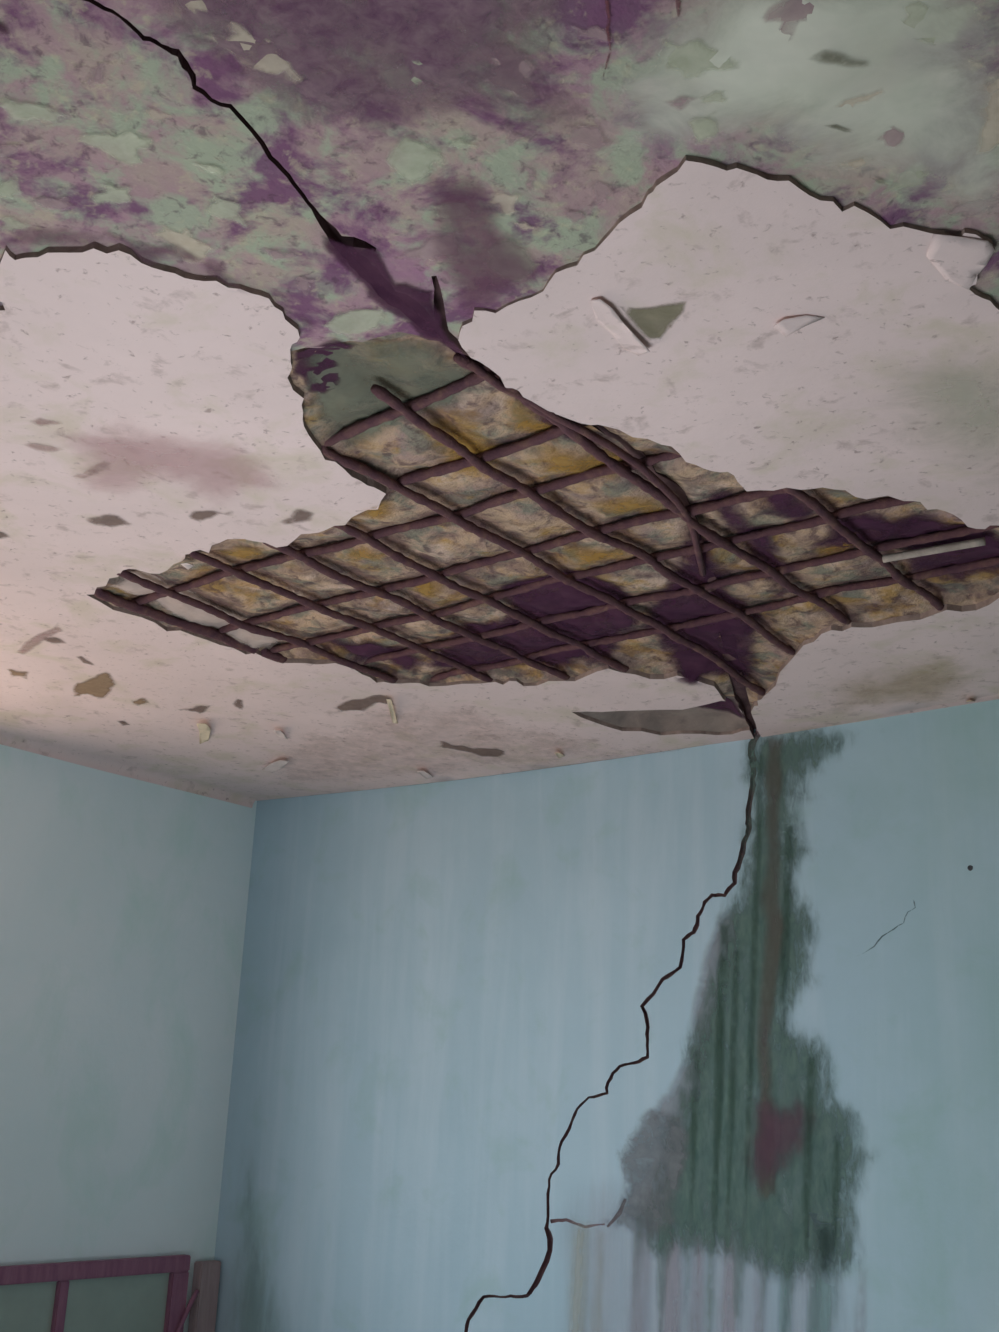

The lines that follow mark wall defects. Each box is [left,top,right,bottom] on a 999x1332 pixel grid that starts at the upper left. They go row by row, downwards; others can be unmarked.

crack [84,0,376,251]
leakage [172,0,553,117]
leakage [636,0,995,194]
leakage [440,192,530,301]
crack [431,276,469,356]
peeling [0,0,999,732]
corrosion [367,503,386,518]
corrosion [437,426,488,459]
corrosion [548,455,621,473]
crack [592,425,704,543]
crack [464,633,760,1332]
leakage [617,731,862,1332]